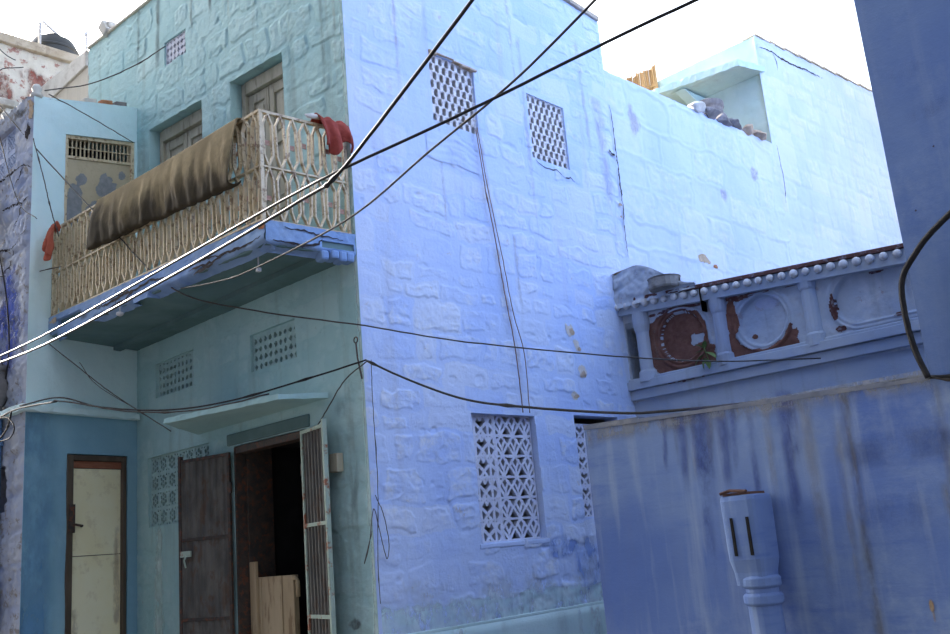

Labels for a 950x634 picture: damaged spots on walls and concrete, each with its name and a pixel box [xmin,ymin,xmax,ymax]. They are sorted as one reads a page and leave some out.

peeling [649,303,716,384]
peeling [725,285,800,357]